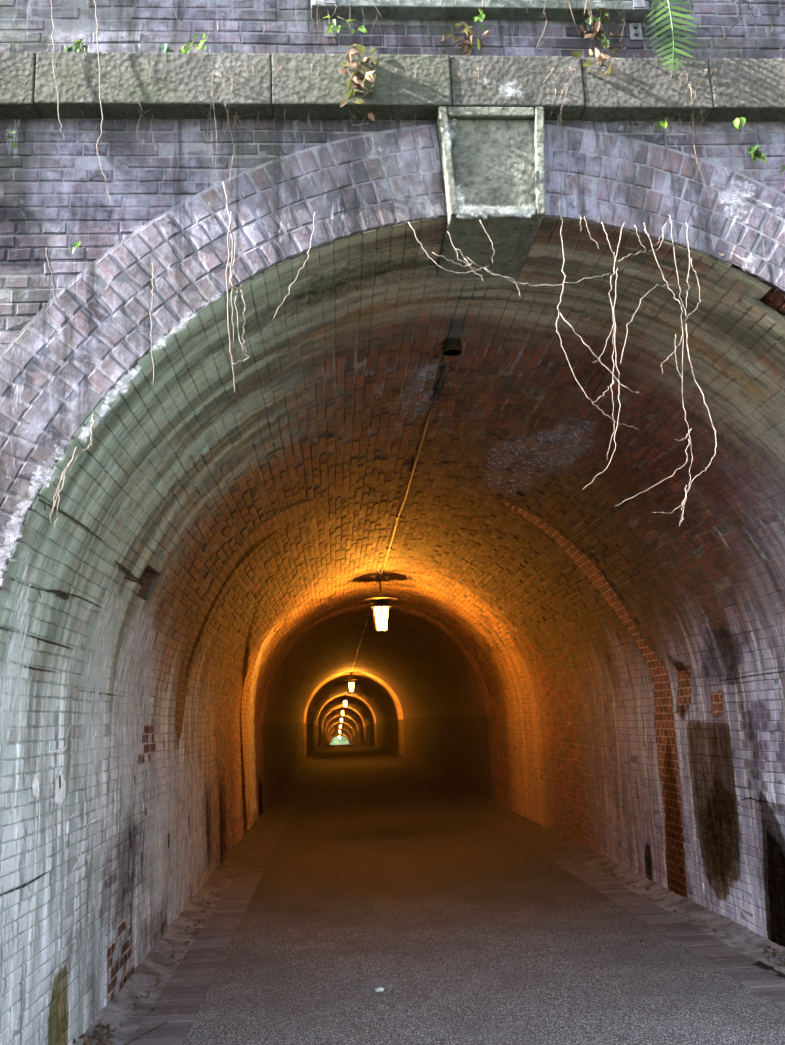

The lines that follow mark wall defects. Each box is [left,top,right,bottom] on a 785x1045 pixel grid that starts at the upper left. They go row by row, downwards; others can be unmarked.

spalling [731,266,785,316]
damp [687,722,785,947]
damp [48,967,69,1045]